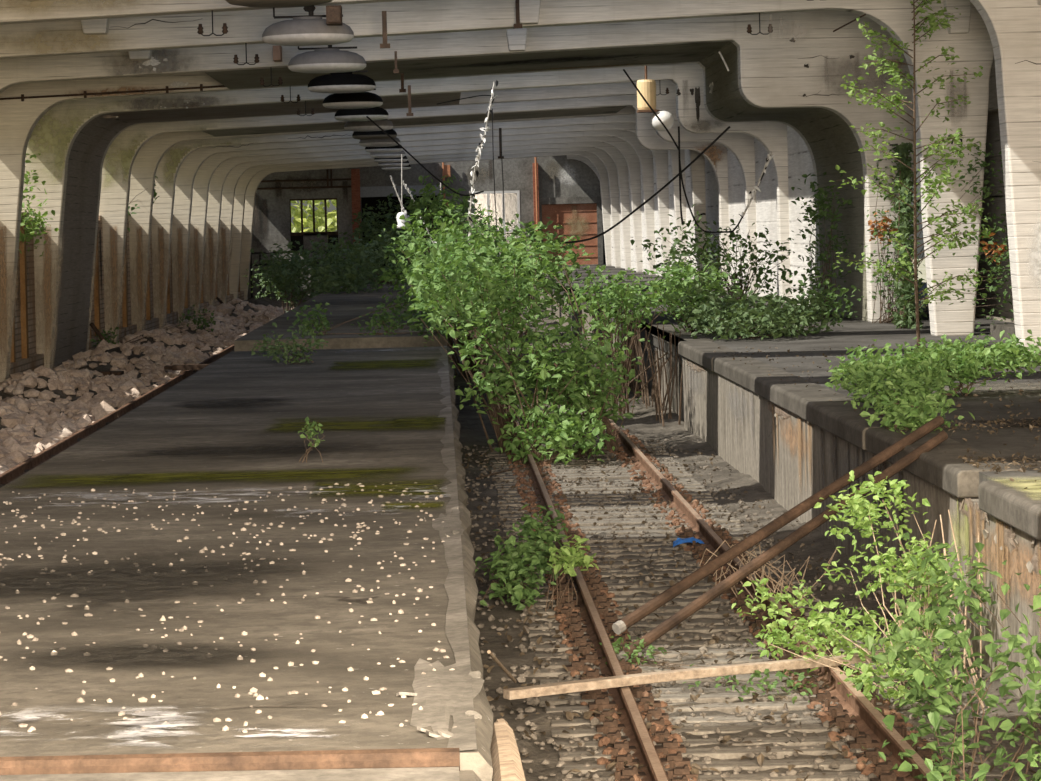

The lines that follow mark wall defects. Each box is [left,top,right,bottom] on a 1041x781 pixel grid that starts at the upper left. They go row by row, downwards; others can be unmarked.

spalling [396,658,485,740]